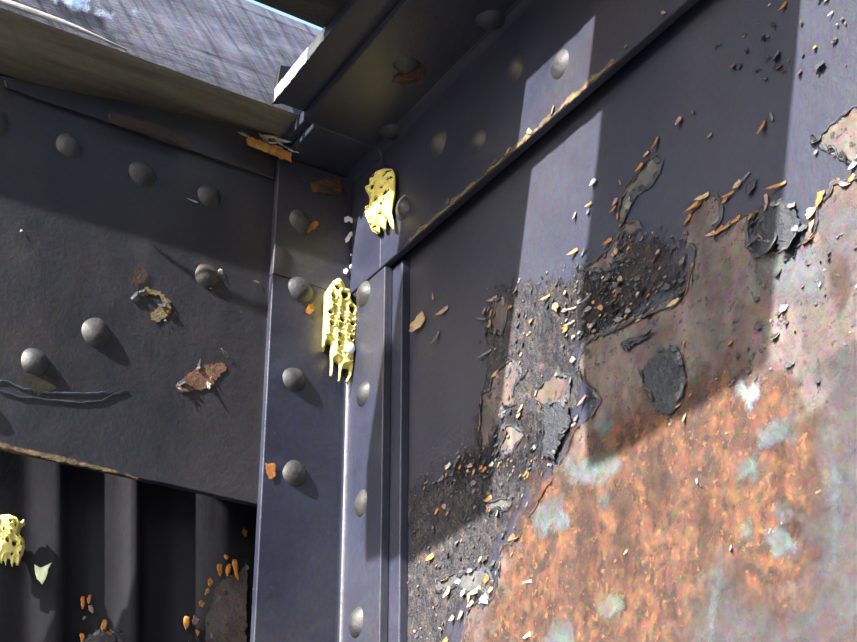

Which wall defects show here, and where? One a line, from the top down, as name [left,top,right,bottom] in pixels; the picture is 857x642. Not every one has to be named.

water stain [54,0,110,17]
rust [237,131,299,162]
rust [831,258,847,307]
peeling [131,286,172,323]
crack [0,380,127,404]
peeling [407,105,857,642]
rust [482,356,820,642]